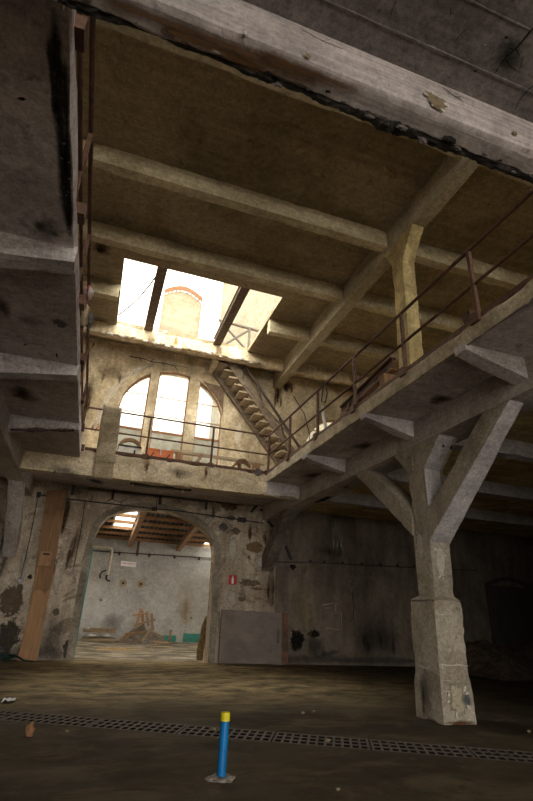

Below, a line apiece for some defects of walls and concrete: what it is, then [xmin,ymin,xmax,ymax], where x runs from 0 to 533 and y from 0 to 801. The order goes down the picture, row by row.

damp [46,13,72,233]
spalling [46,0,533,184]
flaking render [0,574,32,656]
spalling [289,628,322,652]
flaking render [448,682,471,719]